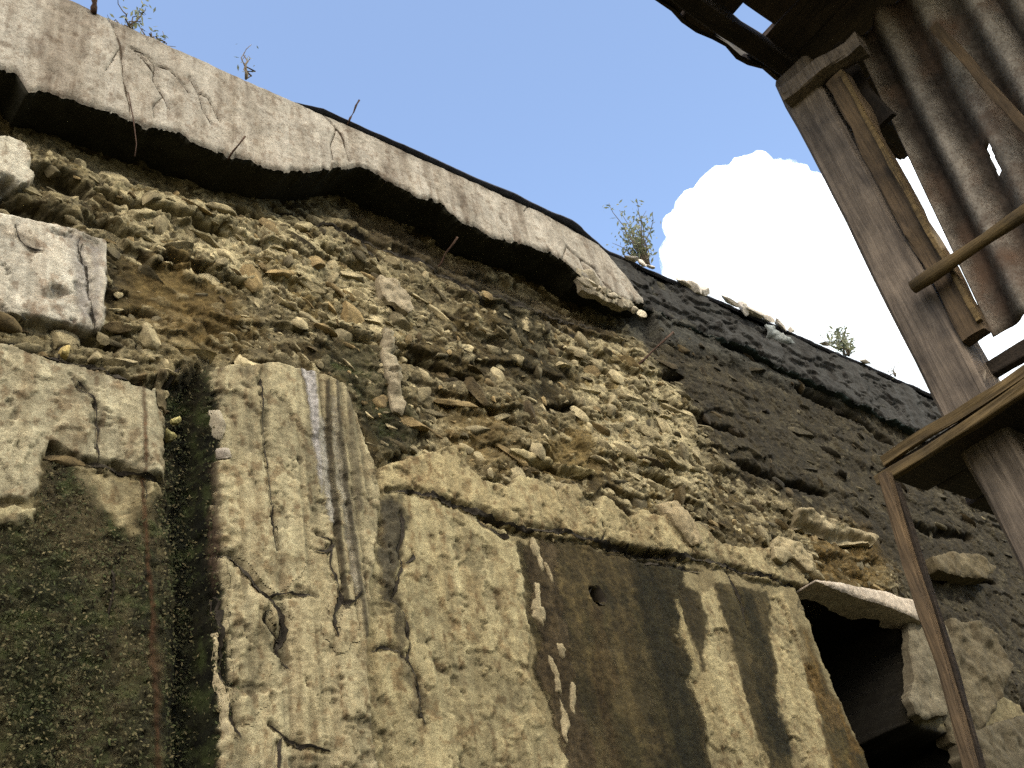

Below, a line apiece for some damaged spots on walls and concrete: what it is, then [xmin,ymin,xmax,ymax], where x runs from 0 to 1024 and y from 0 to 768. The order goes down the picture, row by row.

crack [106,15,219,123]
crack [77,239,96,329]
crack [43,345,180,499]
spalling [0,112,922,600]
rust [141,386,155,651]
crack [209,597,242,738]
crack [210,535,363,669]
crack [372,489,794,724]
damp [517,539,711,768]
spalling [800,599,903,682]
spalling [894,480,1024,713]
crack [269,725,331,768]